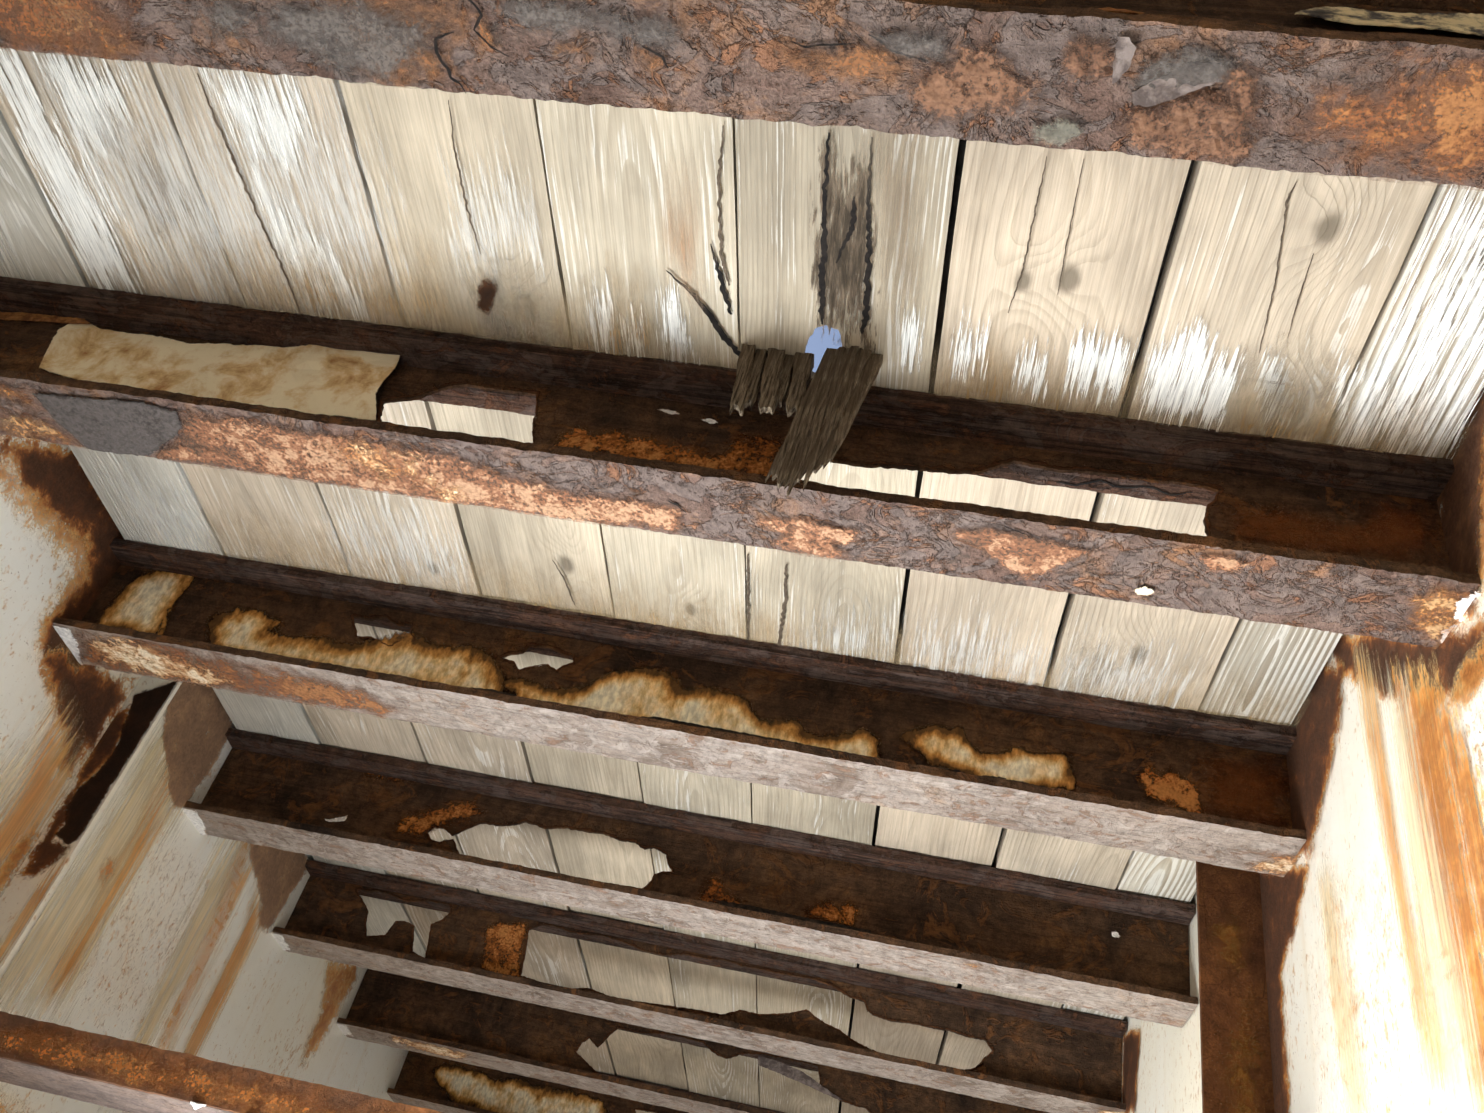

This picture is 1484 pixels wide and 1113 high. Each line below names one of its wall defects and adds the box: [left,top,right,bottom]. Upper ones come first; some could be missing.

rust [1060,35,1268,163]
rust [1290,52,1484,185]
crack [666,125,741,356]
crack [809,132,880,353]
peeling [39,324,400,421]
rust [157,413,683,531]
peeling [96,570,195,635]
rust [0,386,396,959]
peeling [206,607,881,758]
peeling [900,724,1077,791]
rust [1136,386,1484,1113]
peeling [389,1035,609,1113]